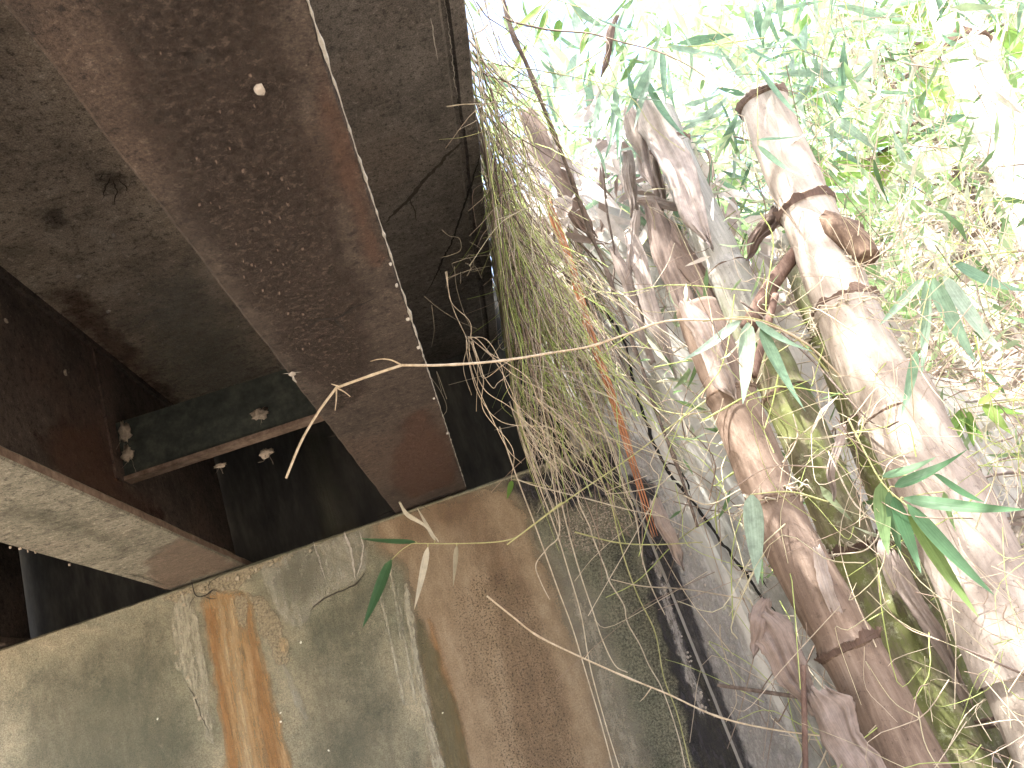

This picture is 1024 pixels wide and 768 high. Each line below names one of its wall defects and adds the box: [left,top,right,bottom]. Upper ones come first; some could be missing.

crack [386,142,481,293]
water stain [306,0,752,768]
corrosion [203,591,292,768]